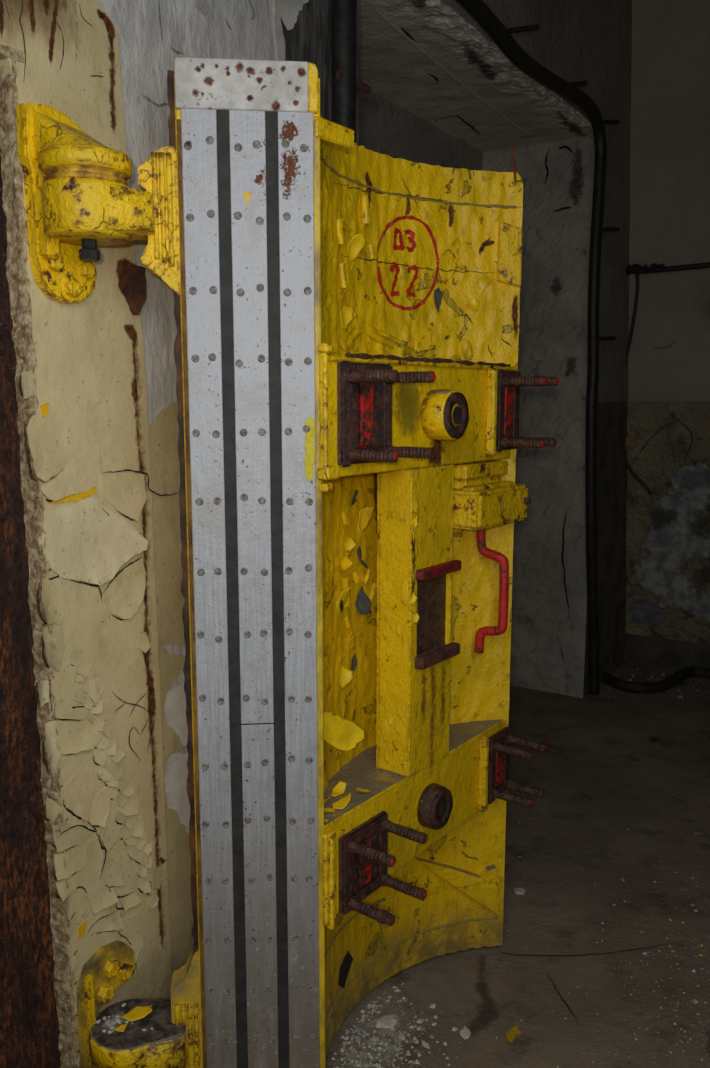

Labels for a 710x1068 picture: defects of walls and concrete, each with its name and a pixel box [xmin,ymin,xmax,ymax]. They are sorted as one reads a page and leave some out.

rust [0,0,65,62]
rust [97,10,116,129]
peeling [273,0,309,61]
rust [116,258,146,480]
crack [104,469,177,496]
crack [95,533,143,599]
peeling [626,457,710,629]
crack [51,691,154,759]
peeling [19,370,194,1068]
rust [143,650,166,868]